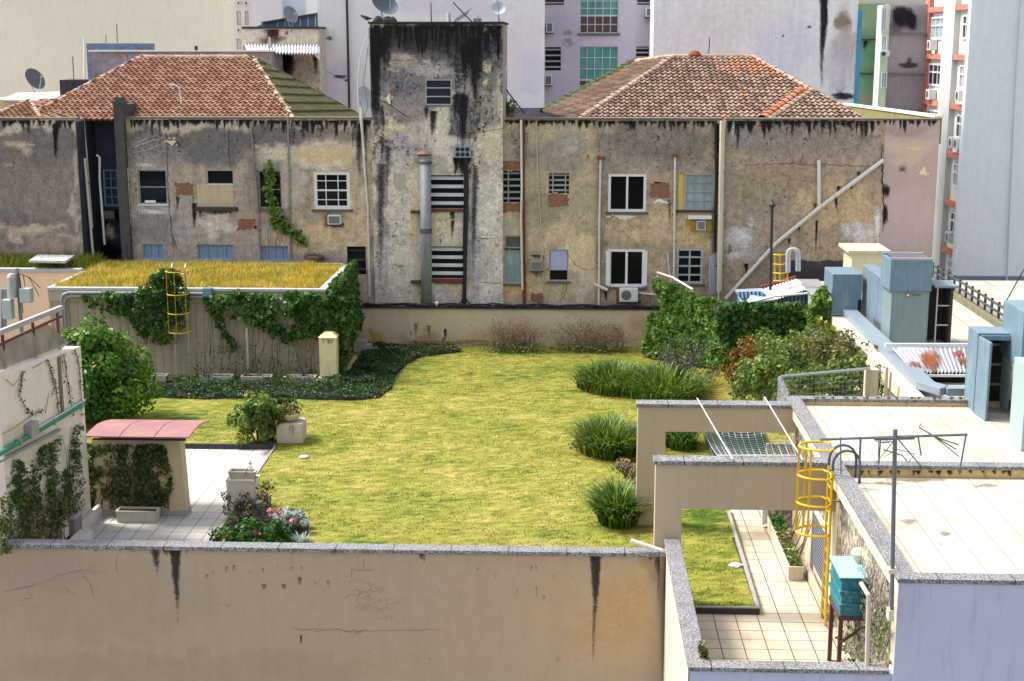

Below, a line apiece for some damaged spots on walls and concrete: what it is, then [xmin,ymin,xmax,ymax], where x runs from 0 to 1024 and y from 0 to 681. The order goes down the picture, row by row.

damp [820,0,851,76]
damp [892,7,917,29]
damp [130,26,501,164]
damp [505,120,937,178]
crack [131,134,177,257]
spalling [174,181,195,197]
spalling [236,217,257,231]
spalling [547,192,574,210]
spalling [649,181,672,204]
corrosion [906,350,941,372]
damp [152,550,187,603]
damp [590,556,601,646]